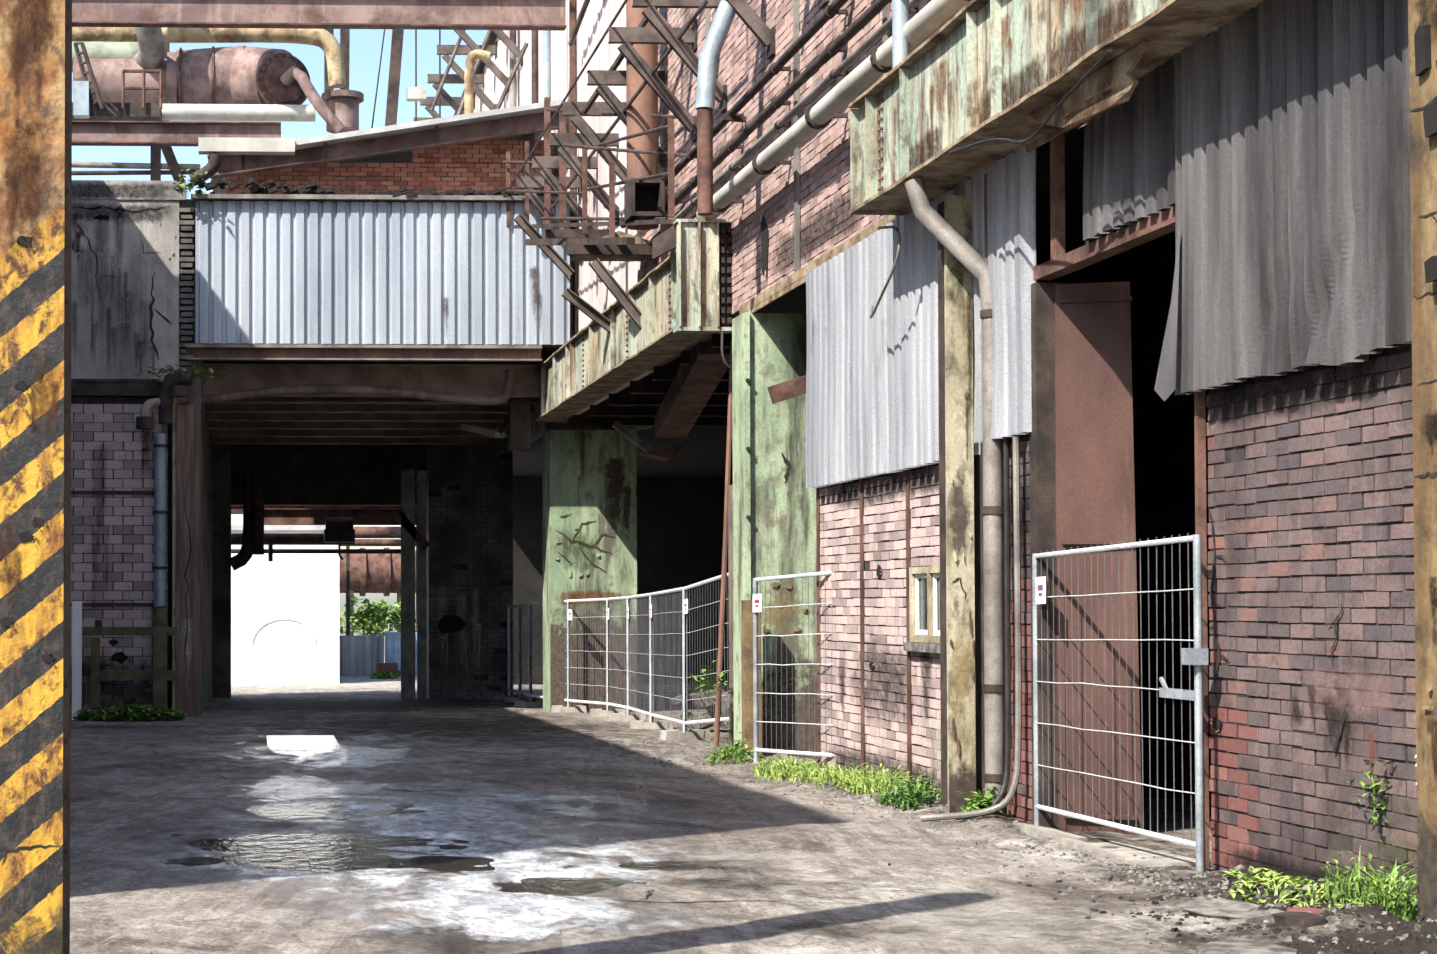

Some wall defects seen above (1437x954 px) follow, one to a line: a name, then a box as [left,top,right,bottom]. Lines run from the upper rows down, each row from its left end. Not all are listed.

rust [8,0,53,96]
rust [909,62,951,172]
rust [979,0,1133,128]
rust [5,119,39,230]
crack [72,206,172,360]
crack [556,514,616,572]
leakage [604,458,631,539]